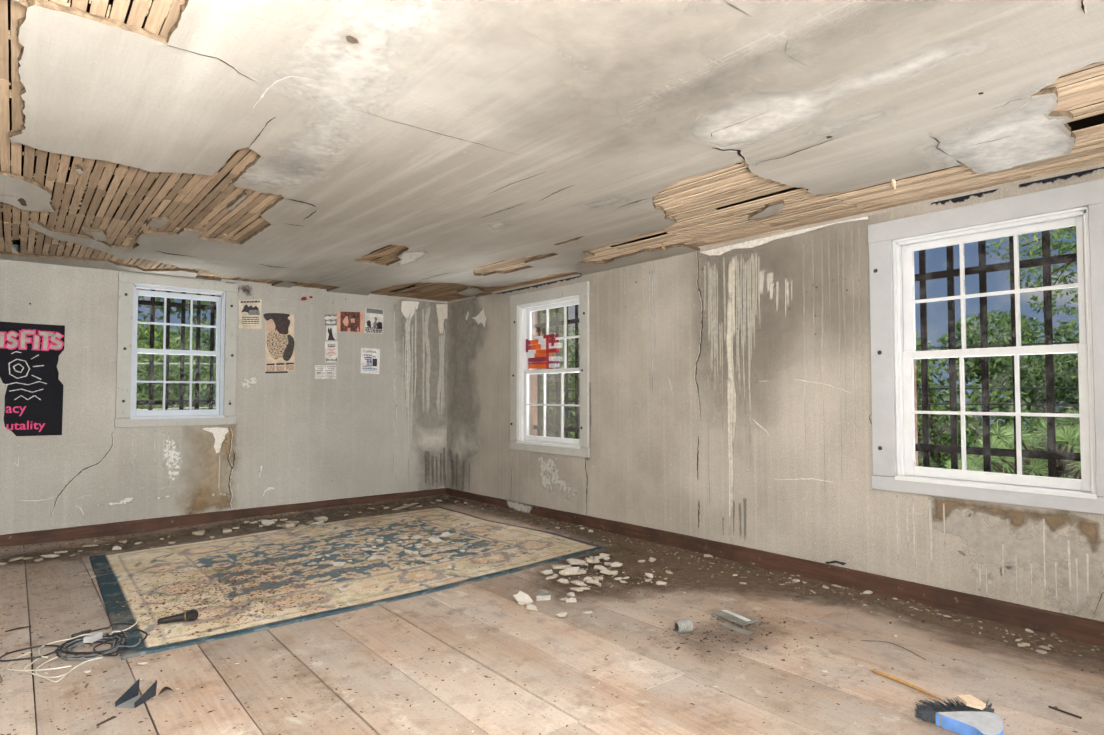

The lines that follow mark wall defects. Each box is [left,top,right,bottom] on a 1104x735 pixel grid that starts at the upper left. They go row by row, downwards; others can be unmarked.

flaking render [0,0,340,291]
flaking render [355,245,409,266]
flaking render [369,61,1104,336]
crack [51,429,116,515]
peeling [202,427,229,453]
damp [393,303,481,487]
crack [694,252,703,528]
damp [704,254,843,535]
peeling [932,508,1104,615]